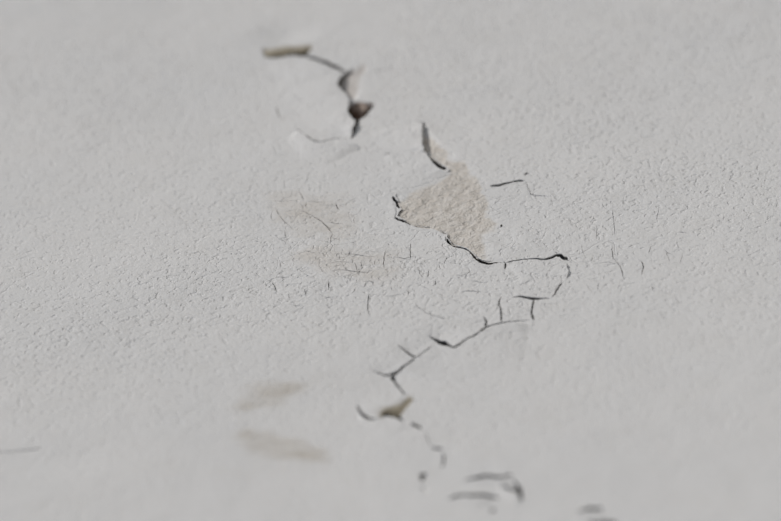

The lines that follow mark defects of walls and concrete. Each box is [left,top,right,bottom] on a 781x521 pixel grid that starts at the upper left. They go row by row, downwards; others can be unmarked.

spalling [262,42,312,58]
spalling [337,57,374,126]
peeling [384,122,506,273]
crack [511,253,584,262]
crack [376,285,561,394]
crack [411,423,445,468]
peeling [447,488,520,511]
crack [450,475,523,501]